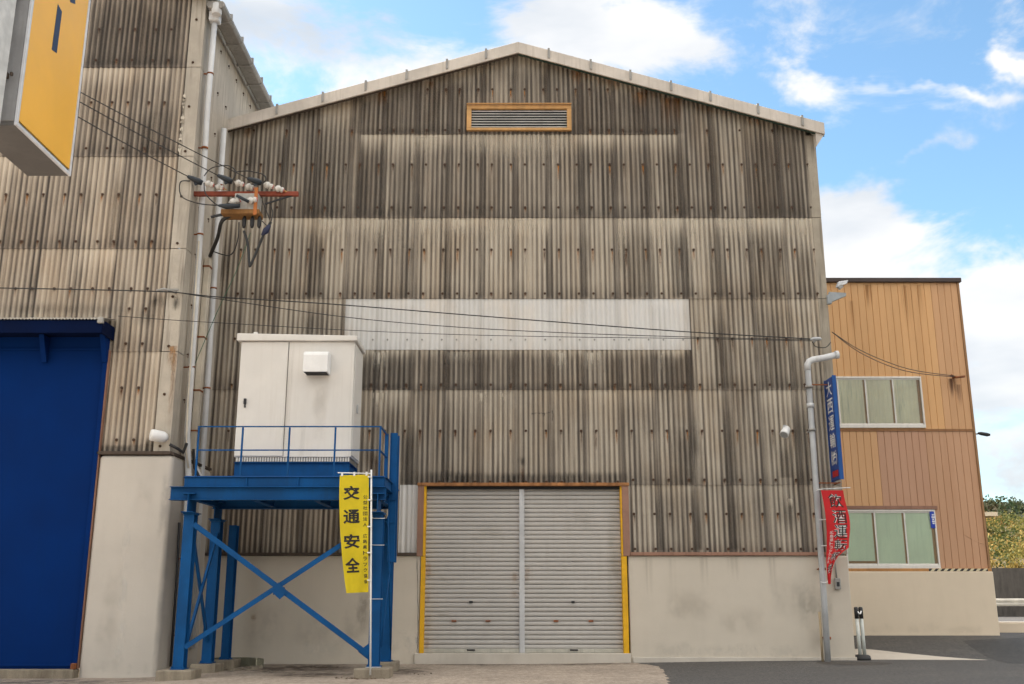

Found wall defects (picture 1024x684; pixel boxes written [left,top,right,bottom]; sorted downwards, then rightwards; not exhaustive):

leakage [150,25,175,64]
leakage [306,151,339,230]
leakage [308,252,321,296]
leakage [672,245,689,296]
leakage [363,352,405,403]